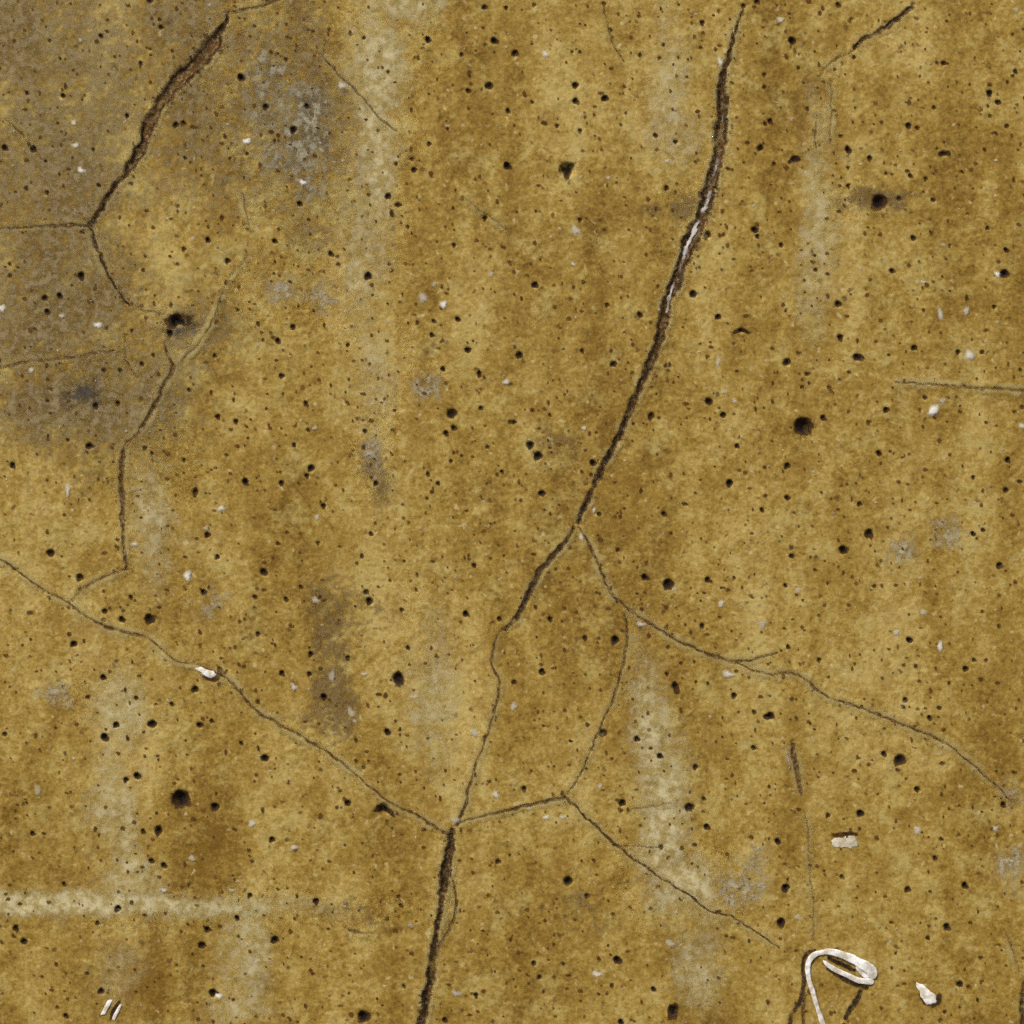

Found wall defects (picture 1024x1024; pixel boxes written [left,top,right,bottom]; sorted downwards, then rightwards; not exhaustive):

crack [2,0,276,312]
crack [330,65,397,131]
crack [0,333,138,378]
crack [84,305,217,588]
crack [479,5,1024,802]
crack [0,559,779,1024]